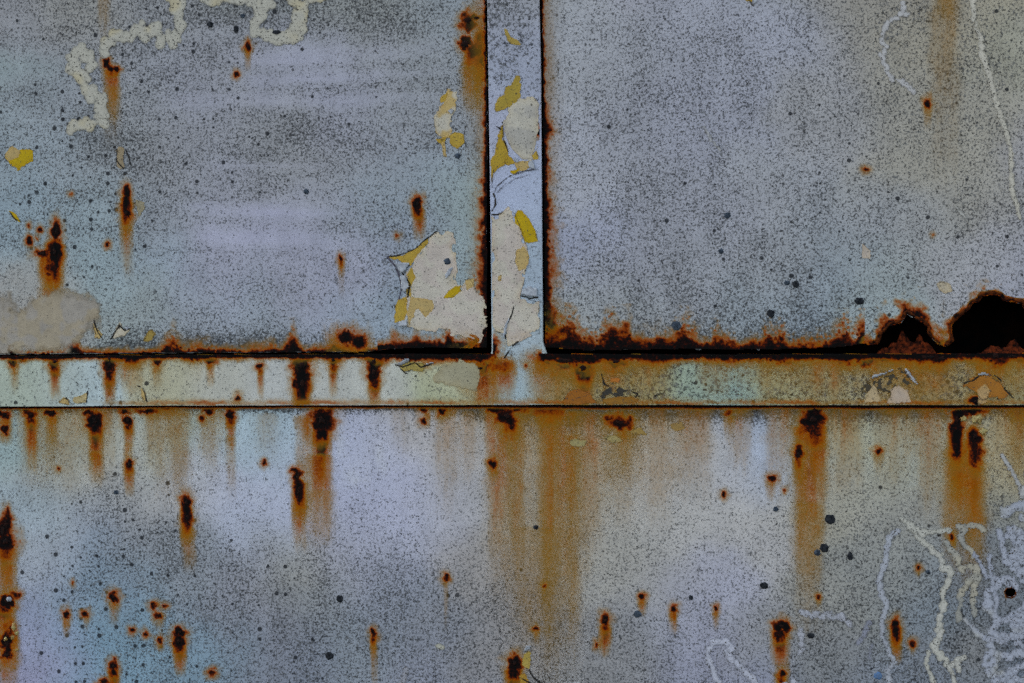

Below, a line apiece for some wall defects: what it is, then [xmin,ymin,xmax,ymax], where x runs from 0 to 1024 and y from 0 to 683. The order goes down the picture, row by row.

peeling [434,89,465,157]
peeling [490,75,539,181]
peeling [388,207,540,359]
rust [0,0,1024,535]
rust [178,491,194,553]
rust [0,505,23,678]
rust [594,611,611,649]